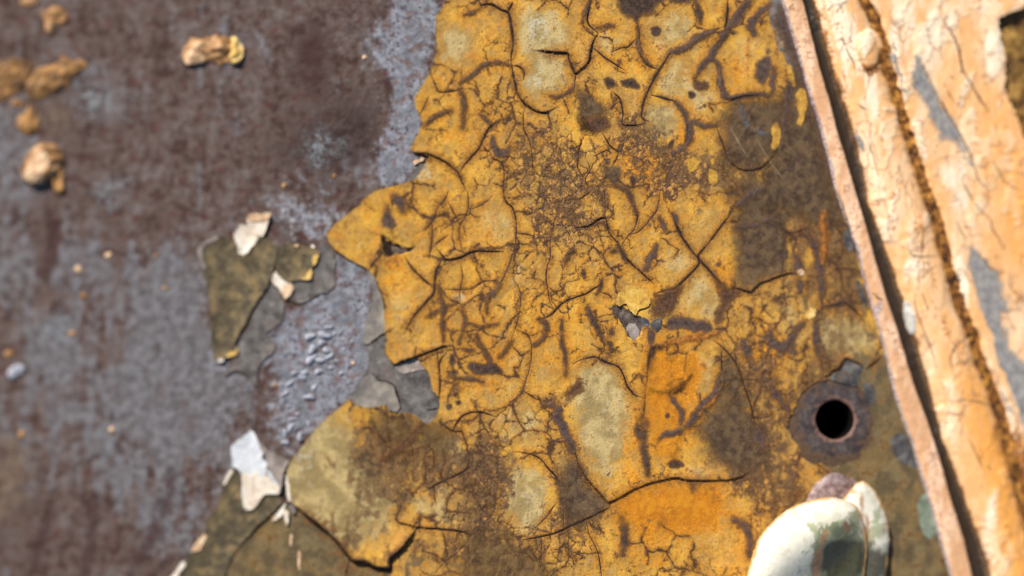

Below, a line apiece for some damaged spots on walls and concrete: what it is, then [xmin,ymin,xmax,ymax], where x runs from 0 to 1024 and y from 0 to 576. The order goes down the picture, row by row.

rust [19,0,69,33]
rust [181,34,244,67]
rust [0,56,123,195]
rust [302,131,345,168]
rust [381,196,406,229]
peeling [0,0,445,576]
crack [292,0,882,576]
rust [480,0,853,557]
rust [764,375,874,467]